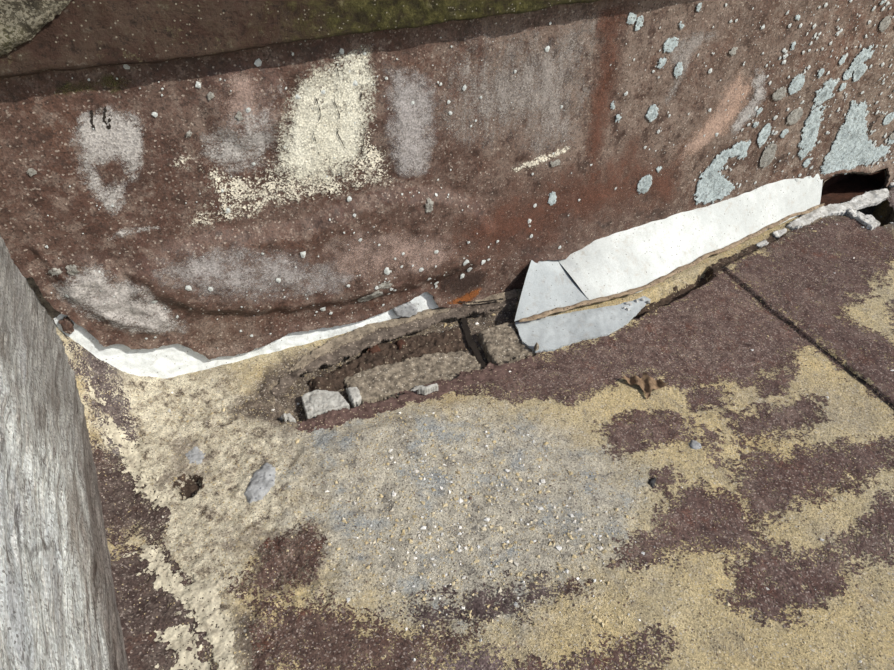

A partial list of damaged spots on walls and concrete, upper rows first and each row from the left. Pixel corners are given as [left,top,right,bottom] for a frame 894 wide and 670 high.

water stain [71,106,143,212]
water stain [192,48,434,225]
peeling [54,292,438,670]
spalling [307,327,467,392]
peeling [414,169,894,635]
peeling [226,519,681,670]